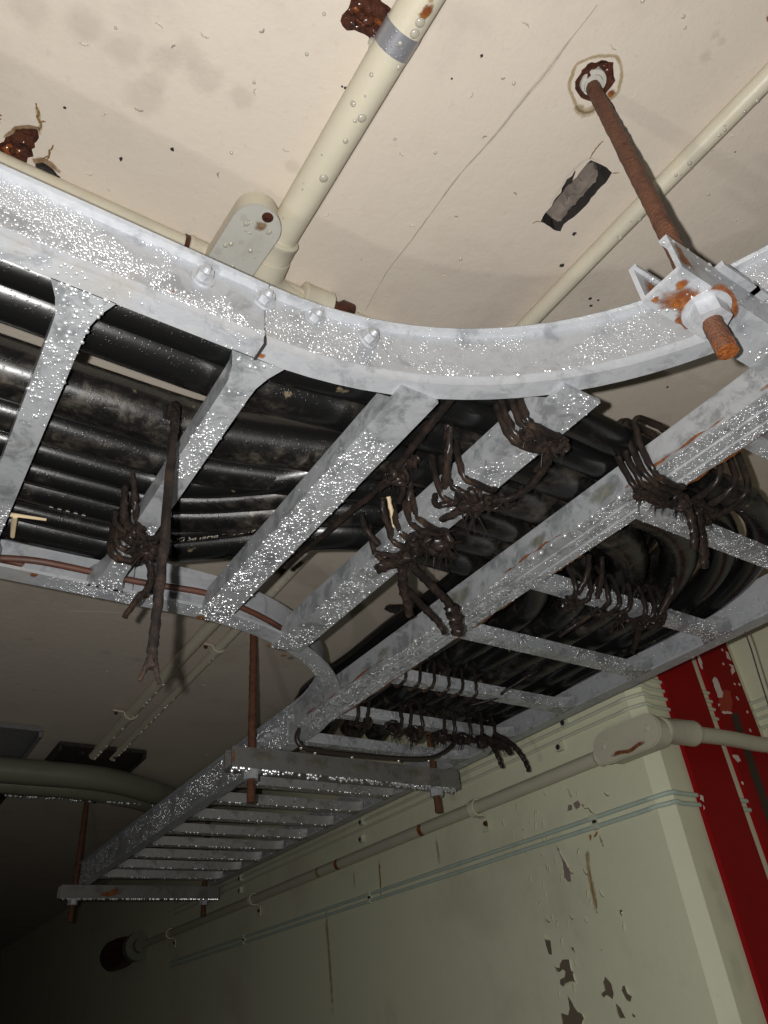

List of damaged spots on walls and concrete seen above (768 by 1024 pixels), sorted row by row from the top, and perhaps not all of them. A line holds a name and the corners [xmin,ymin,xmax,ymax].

peeling [713,677,732,714]
peeling [502,811,588,906]
peeling [543,915,587,1024]
peeling [601,977,636,1019]